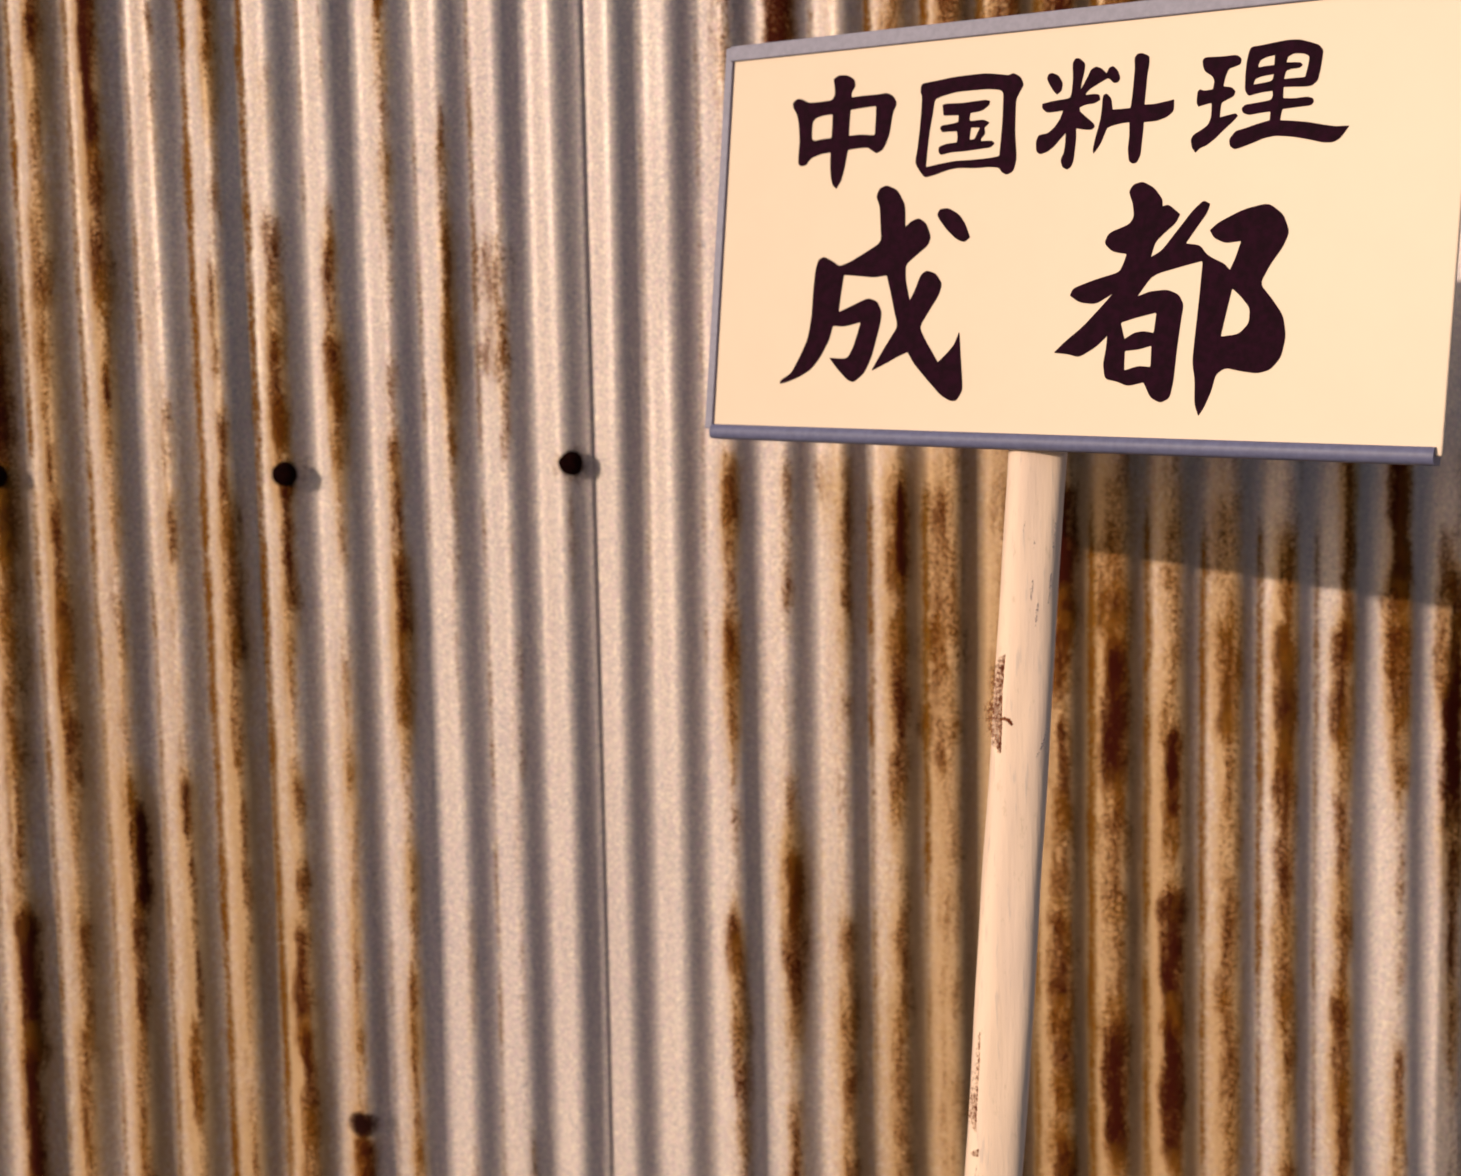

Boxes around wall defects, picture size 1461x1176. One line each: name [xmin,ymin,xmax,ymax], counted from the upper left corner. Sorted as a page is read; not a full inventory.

corrosion [761,0,813,43]
corrosion [320,190,350,565]
corrosion [0,0,99,1176]
corrosion [60,0,208,1176]
corrosion [348,925,381,1176]
corrosion [383,279,426,1176]
corrosion [701,435,742,852]
corrosion [724,897,754,1176]
corrosion [780,779,812,1068]
corrosion [788,1089,804,1176]
corrosion [1379,464,1414,814]
corrosion [1432,496,1461,1175]